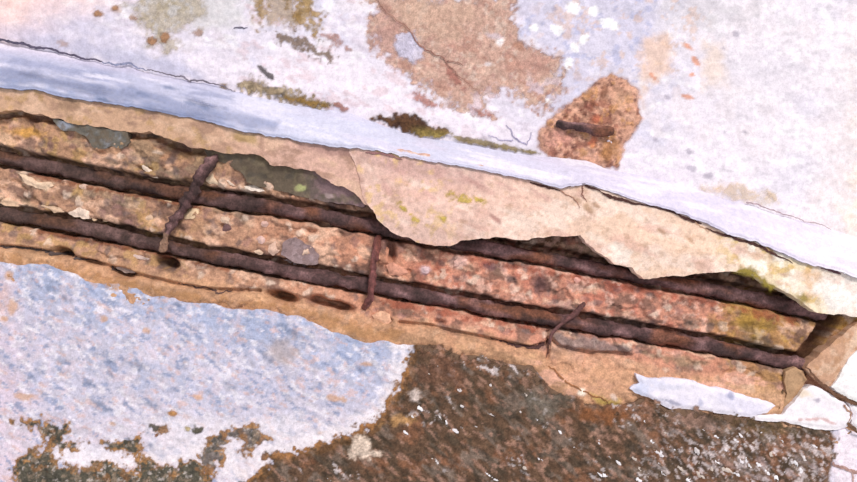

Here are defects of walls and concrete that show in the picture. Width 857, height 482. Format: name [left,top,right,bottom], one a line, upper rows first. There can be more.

crack [378,0,481,96]
peeling [367,0,642,168]
spalling [0,111,377,219]
spalling [0,163,857,432]
water stain [9,344,840,482]